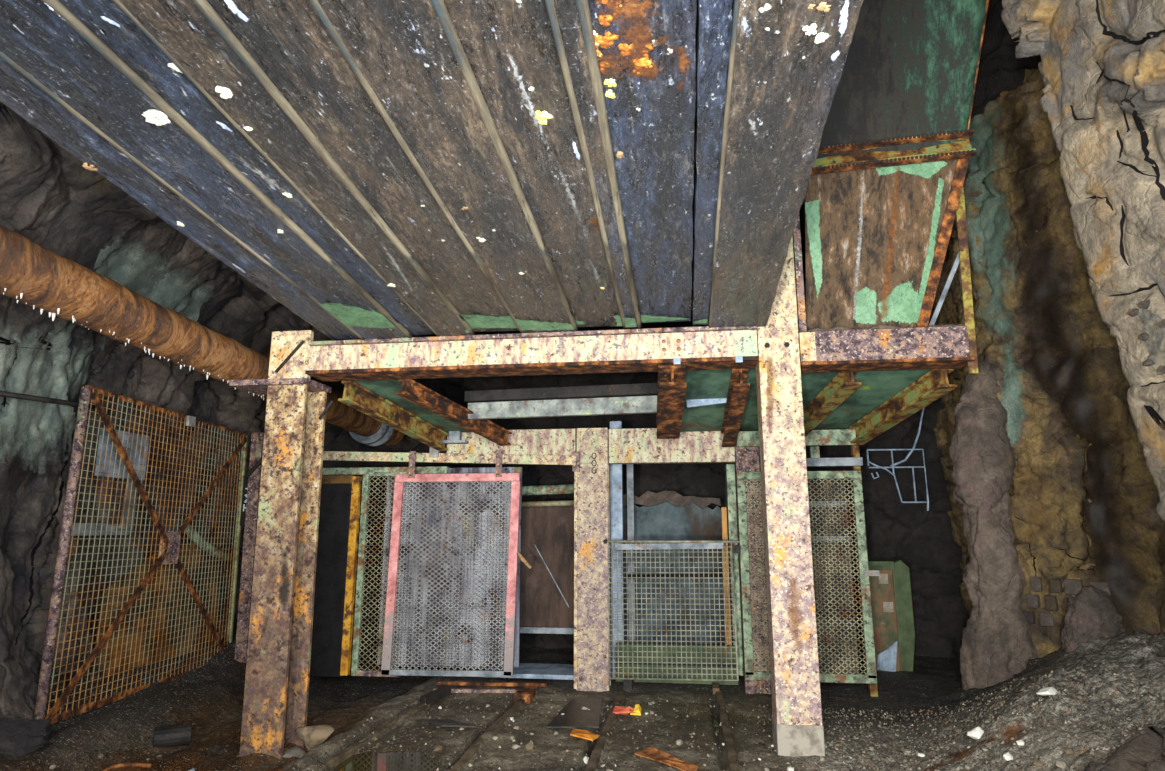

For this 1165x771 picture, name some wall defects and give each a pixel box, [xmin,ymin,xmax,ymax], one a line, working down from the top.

rust [594,0,690,92]
damp [802,2,831,44]
peeling [805,200,823,298]
peeling [855,161,947,324]
rust [90,535,220,680]
rust [279,552,289,605]
rust [790,582,799,638]